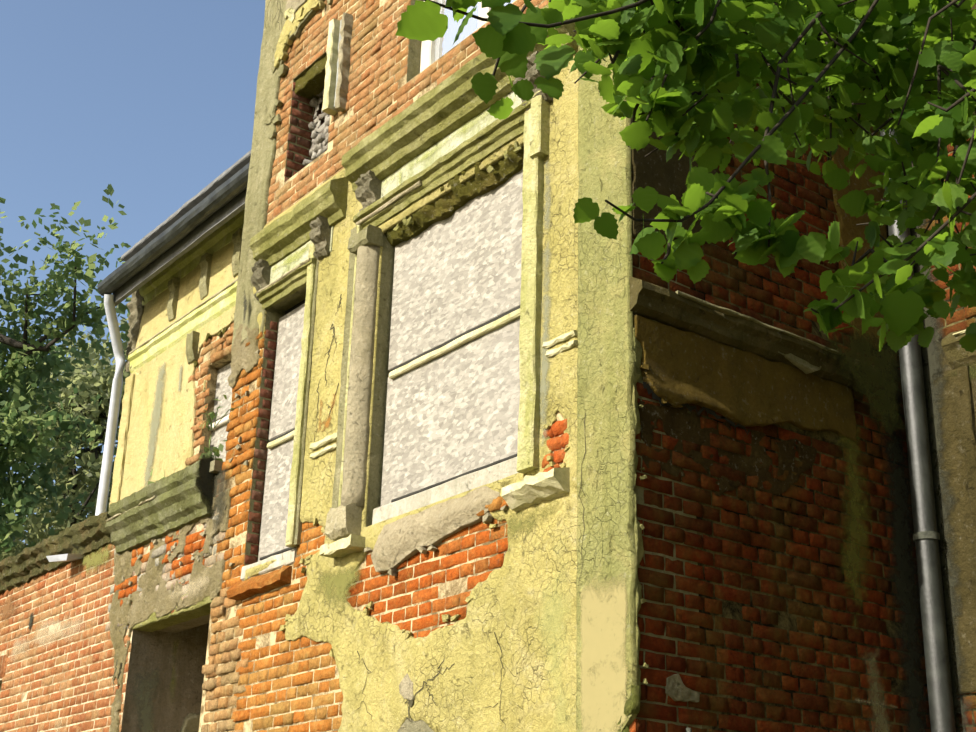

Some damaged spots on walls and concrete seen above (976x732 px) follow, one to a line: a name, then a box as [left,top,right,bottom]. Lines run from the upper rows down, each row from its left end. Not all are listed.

peeling [513,0,549,14]
peeling [263,0,490,224]
crack [314,294,342,440]
flaking render [542,419,570,472]
peeling [114,322,343,732]
peeling [346,496,509,640]
peeling [617,314,857,732]
water stain [855,342,930,732]
crack [355,651,376,717]
crack [402,656,455,720]